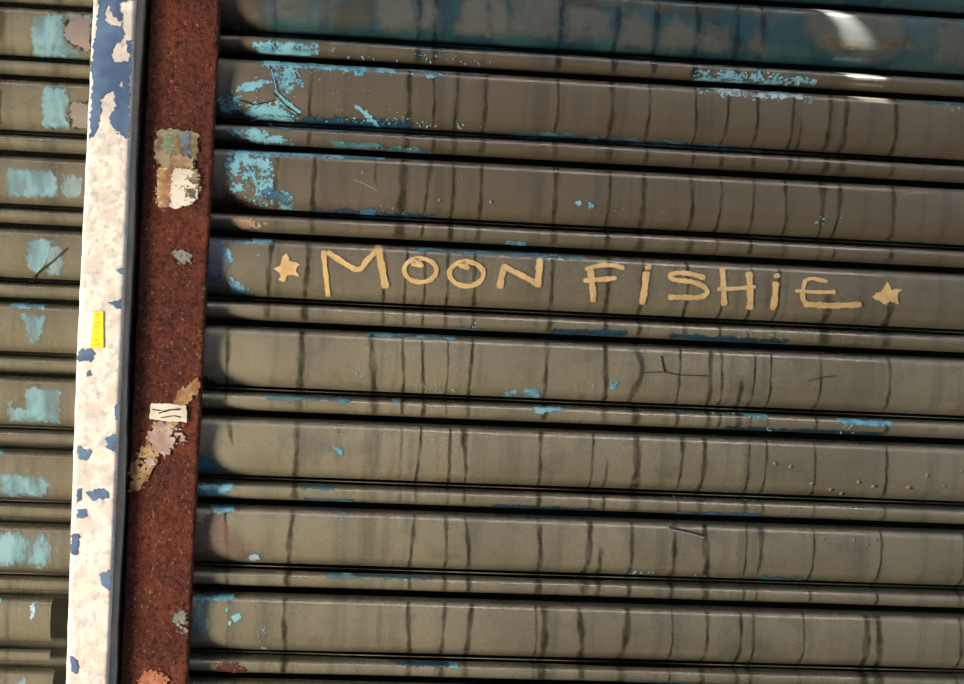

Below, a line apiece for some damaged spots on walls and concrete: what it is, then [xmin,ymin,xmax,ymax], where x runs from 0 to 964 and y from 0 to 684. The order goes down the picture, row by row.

peeling [31,0,134,139]
peeling [217,39,491,221]
peeling [508,131,761,153]
peeling [7,169,83,198]
peeling [28,238,62,278]
peeling [11,302,45,310]
peeling [76,348,94,377]
peeling [77,446,92,461]
peeling [105,434,118,451]
peeling [76,488,109,518]
peeling [70,533,80,555]
peeling [99,570,111,591]